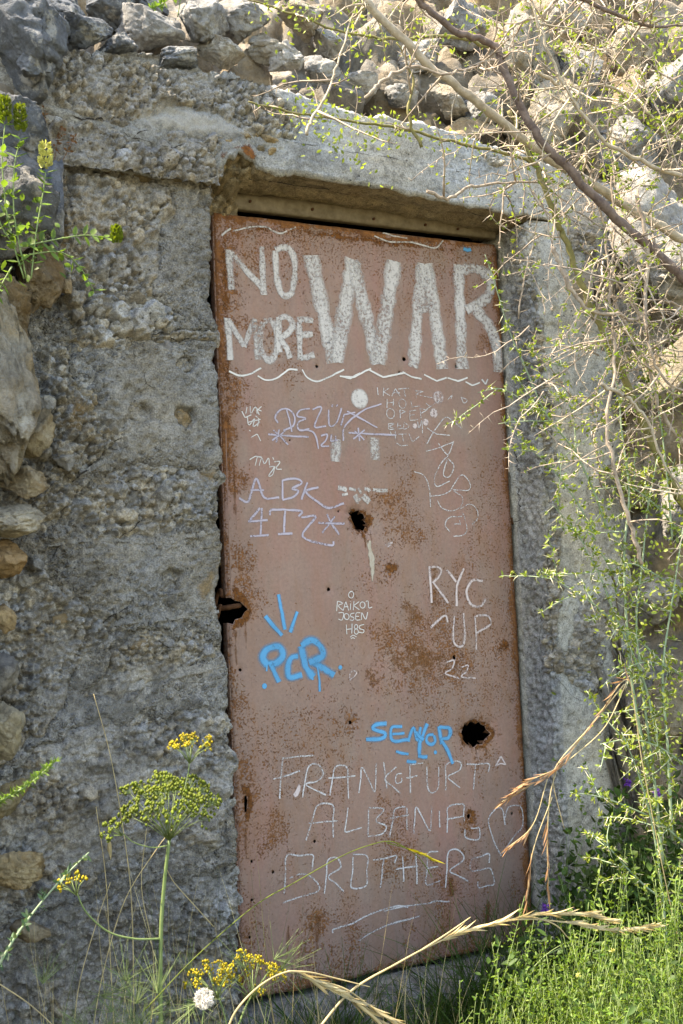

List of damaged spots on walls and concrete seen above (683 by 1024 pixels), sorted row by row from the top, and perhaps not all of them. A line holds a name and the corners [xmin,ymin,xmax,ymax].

rust [220,240,229,323]
rust [231,586,251,639]
rust [391,644,456,681]